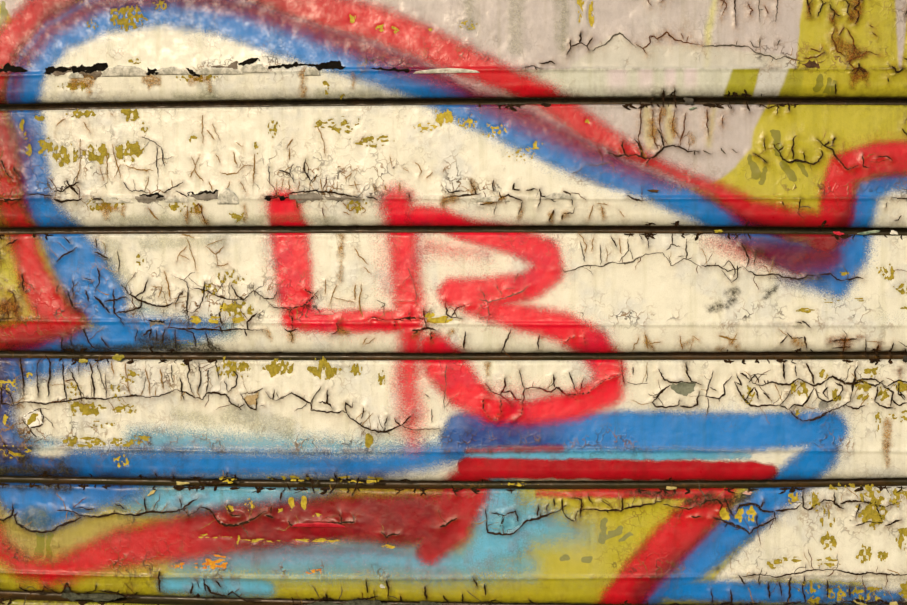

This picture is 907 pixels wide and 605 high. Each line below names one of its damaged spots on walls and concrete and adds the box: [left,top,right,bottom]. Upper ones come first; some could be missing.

crack [525,0,907,94]
spalling [0,63,28,73]
peeling [45,58,345,95]
peeling [19,109,148,167]
peeling [413,109,507,137]
crack [0,468,378,535]
peeling [719,491,757,522]
peeling [788,483,907,568]
peeling [767,556,802,569]
peeling [798,580,907,605]